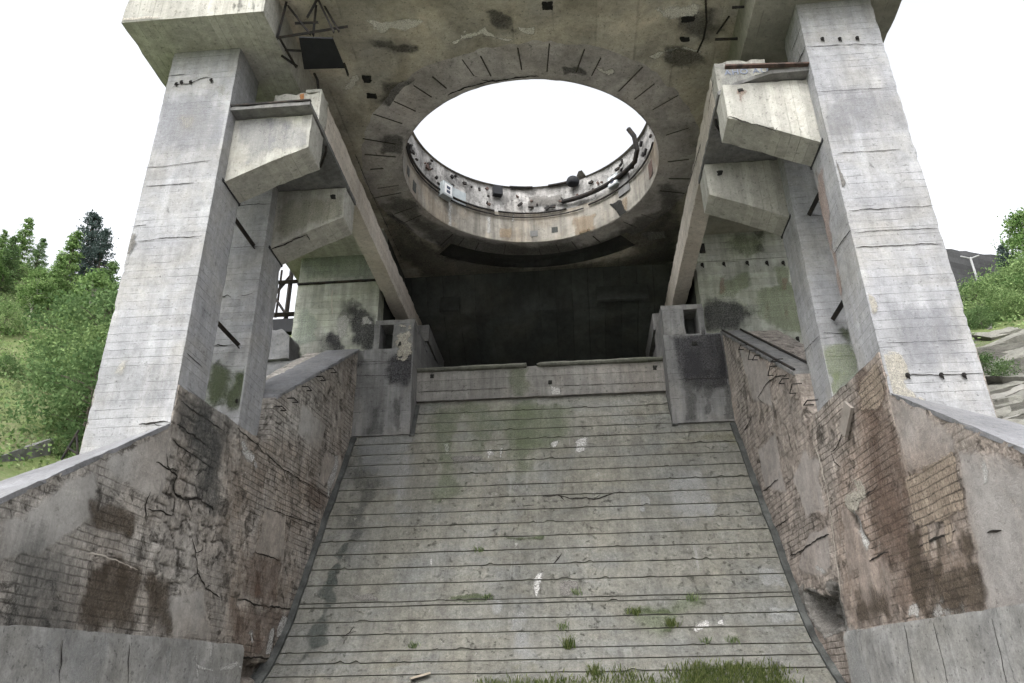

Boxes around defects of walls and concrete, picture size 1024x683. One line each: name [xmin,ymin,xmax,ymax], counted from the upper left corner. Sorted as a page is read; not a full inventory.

spalling [396,324,412,361]
leakage [89,500,134,538]
crack [522,491,626,506]
crack [790,435,878,593]
leakage [80,557,173,634]
leakage [302,543,348,659]
spalling [798,579,848,640]
leakage [908,529,986,618]